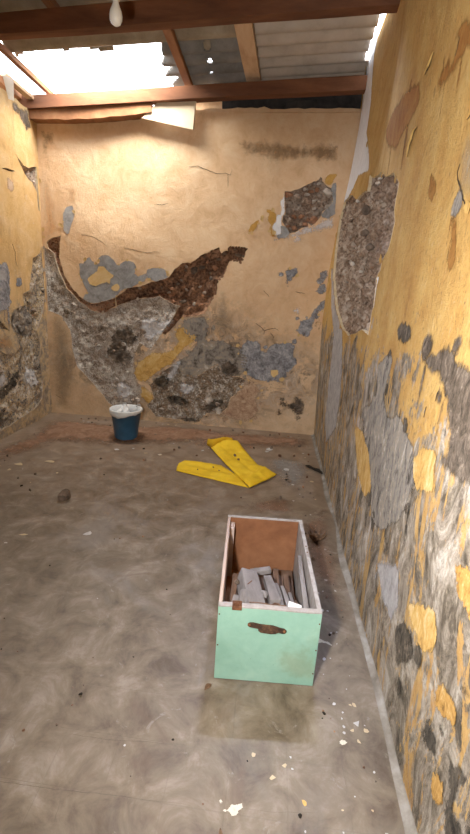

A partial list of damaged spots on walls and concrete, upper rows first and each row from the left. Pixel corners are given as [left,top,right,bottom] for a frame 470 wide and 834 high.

spalling [2,155,42,211]
peeling [451,191,470,219]
spalling [0,172,399,431]